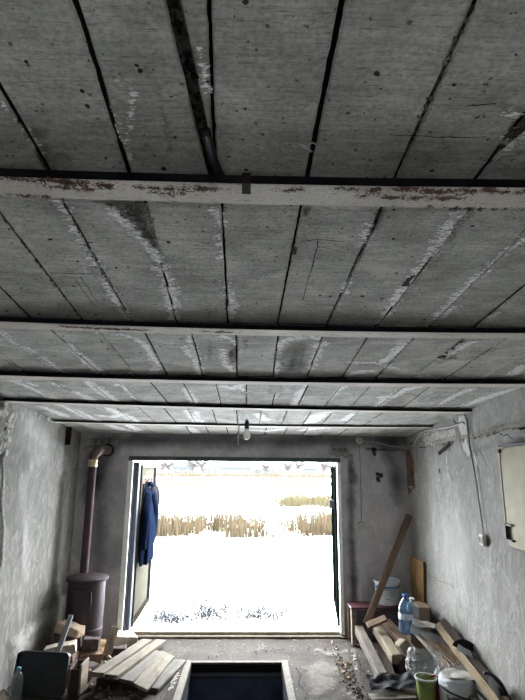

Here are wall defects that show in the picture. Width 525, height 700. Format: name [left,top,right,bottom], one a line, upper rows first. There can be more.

water stain [196,46,213,98]
water stain [109,76,139,162]
crack [395,132,486,140]
corrosion [0,175,229,199]
corrosion [335,185,525,211]
crack [300,239,345,299]
water stain [375,210,476,324]
water stain [241,336,332,432]